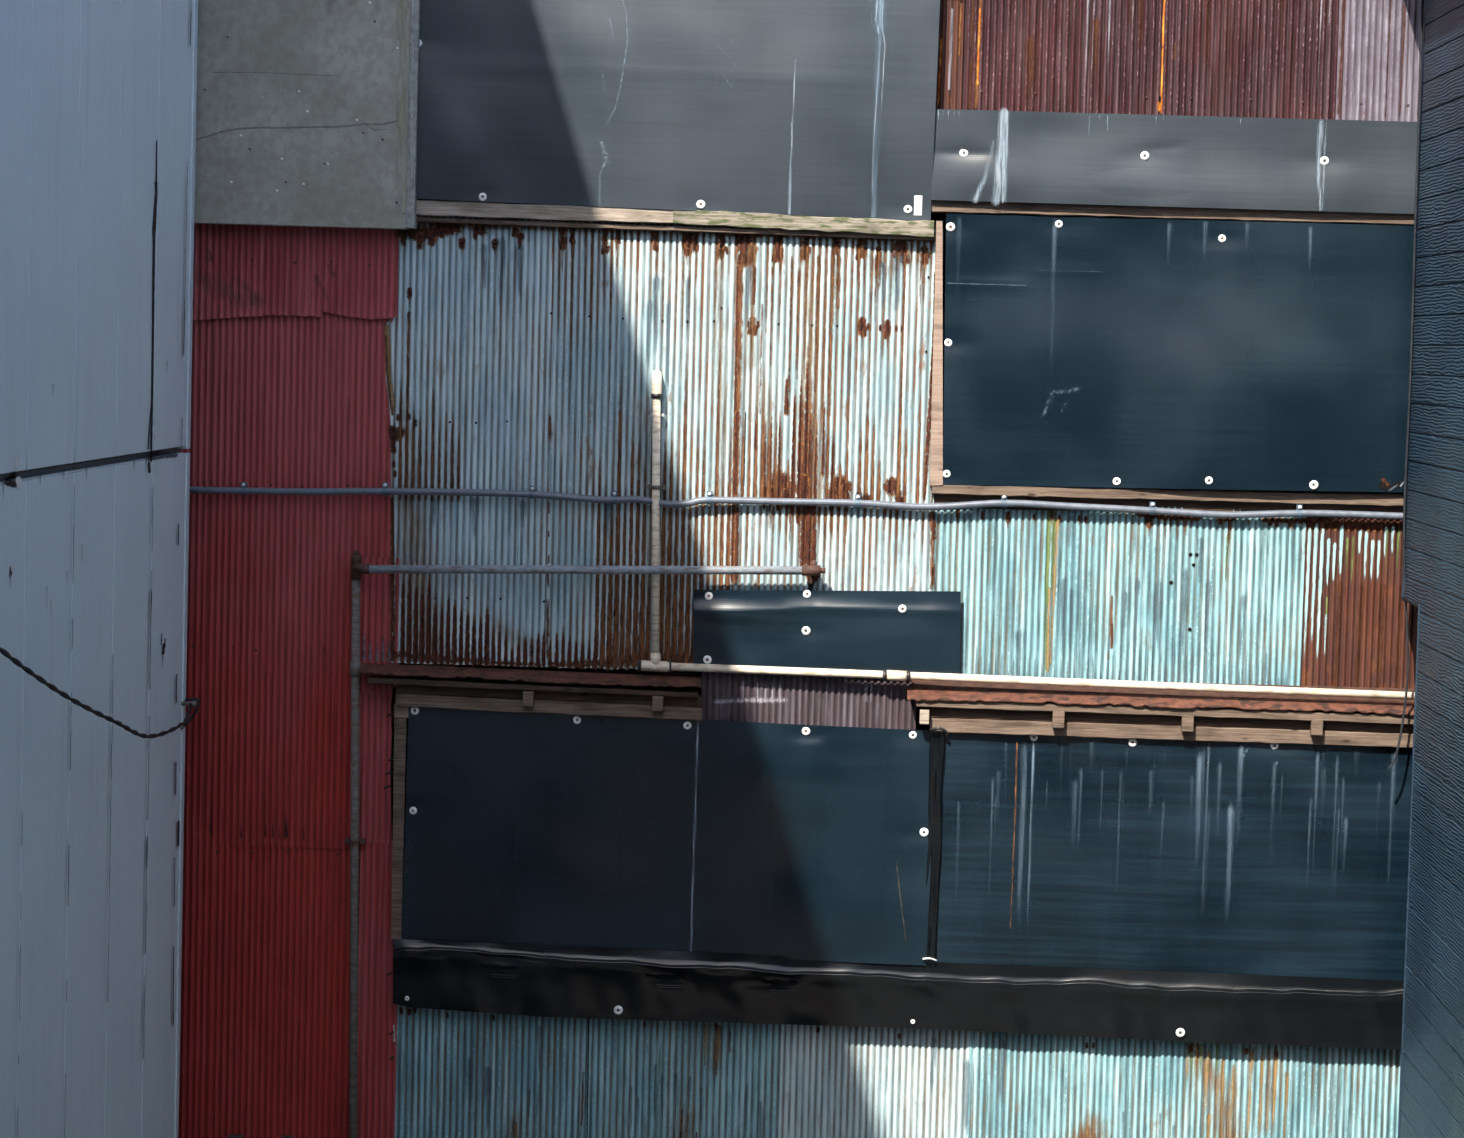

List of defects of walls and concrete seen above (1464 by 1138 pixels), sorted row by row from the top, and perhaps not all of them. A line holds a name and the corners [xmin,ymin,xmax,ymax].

leakage [875,0,885,120]
corrosion [1157,0,1176,113]
crack [106,672,114,1001]
crack [143,497,180,1058]
crack [148,120,400,462]
corrosion [384,220,936,676]
corrosion [1137,513,1403,544]
corrosion [1333,583,1403,688]